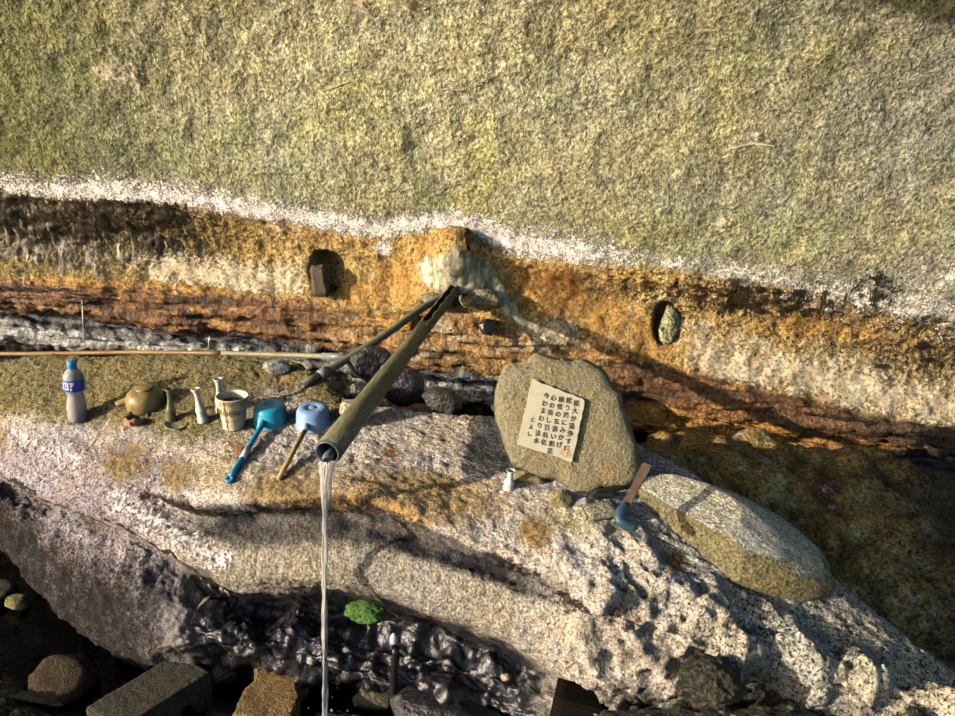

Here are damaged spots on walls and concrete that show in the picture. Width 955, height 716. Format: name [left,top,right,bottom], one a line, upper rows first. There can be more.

damp [0,165,955,427]